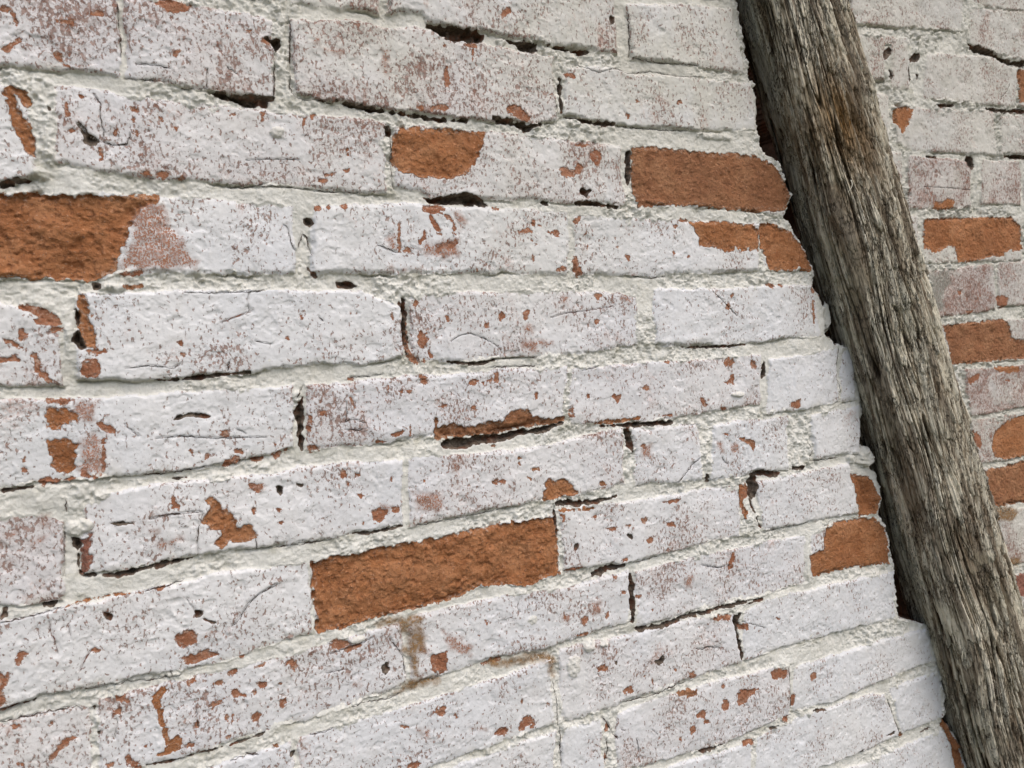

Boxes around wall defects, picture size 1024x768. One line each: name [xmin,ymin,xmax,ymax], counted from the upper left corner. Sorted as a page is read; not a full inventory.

spalling [390,126,486,180]
spalling [626,145,812,289]
spalling [922,198,1023,263]
spalling [0,192,196,384]
spalling [943,295,1024,385]
spalling [38,397,117,487]
spalling [433,392,575,447]
spalling [972,415,1024,507]
spalling [201,496,259,550]
spalling [310,456,597,653]
spalling [810,474,890,577]